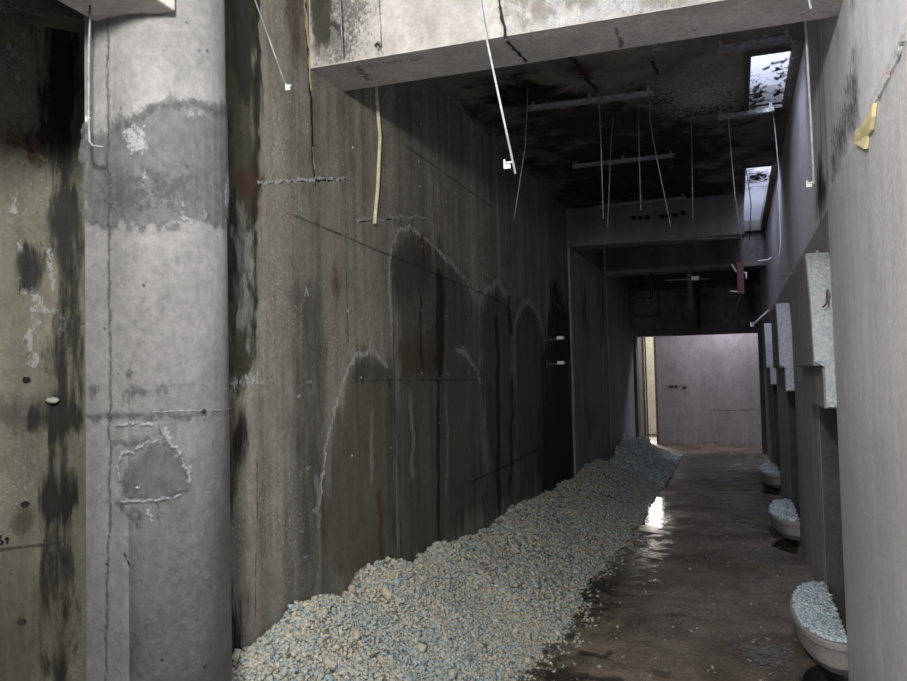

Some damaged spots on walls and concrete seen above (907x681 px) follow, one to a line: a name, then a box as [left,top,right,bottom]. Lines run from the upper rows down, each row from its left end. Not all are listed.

damp [251,0,262,331]
crack [239,0,346,200]
damp [327,0,366,64]
crack [498,0,528,63]
crack [569,56,598,94]
damp [816,51,858,215]
damp [17,27,238,681]
spalling [112,421,192,524]
damp [229,369,266,519]
damp [314,348,395,577]
damp [387,223,574,540]
damp [231,585,243,661]